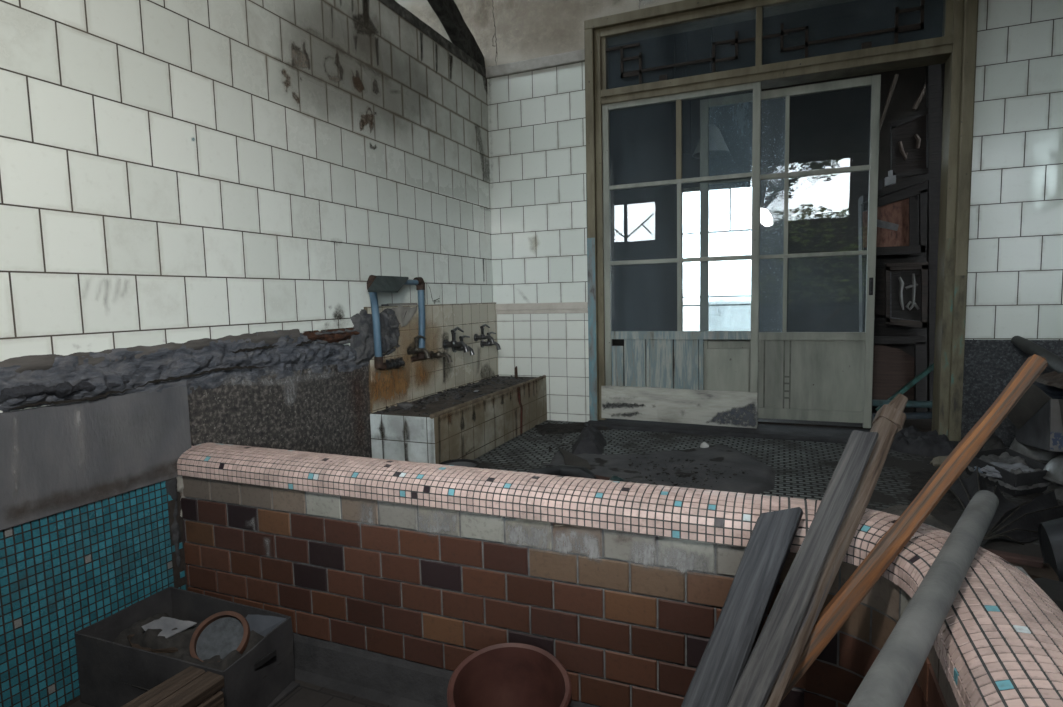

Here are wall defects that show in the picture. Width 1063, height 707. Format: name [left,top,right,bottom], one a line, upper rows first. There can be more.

flaking render [0,327,369,412]
corrosion [371,323,437,403]